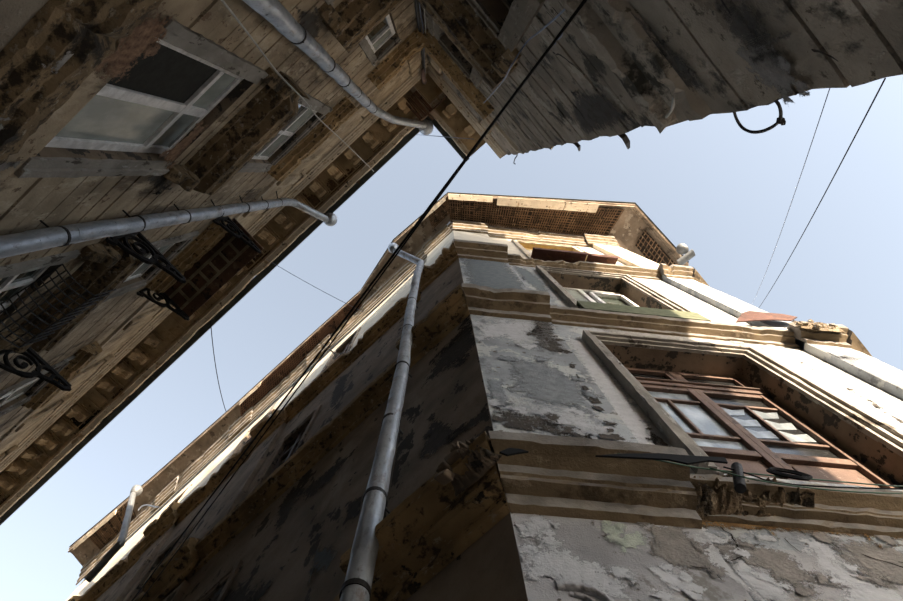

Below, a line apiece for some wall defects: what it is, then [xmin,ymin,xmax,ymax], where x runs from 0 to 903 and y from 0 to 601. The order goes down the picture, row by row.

peeling [435,318,671,447]
peeling [515,514,903,601]